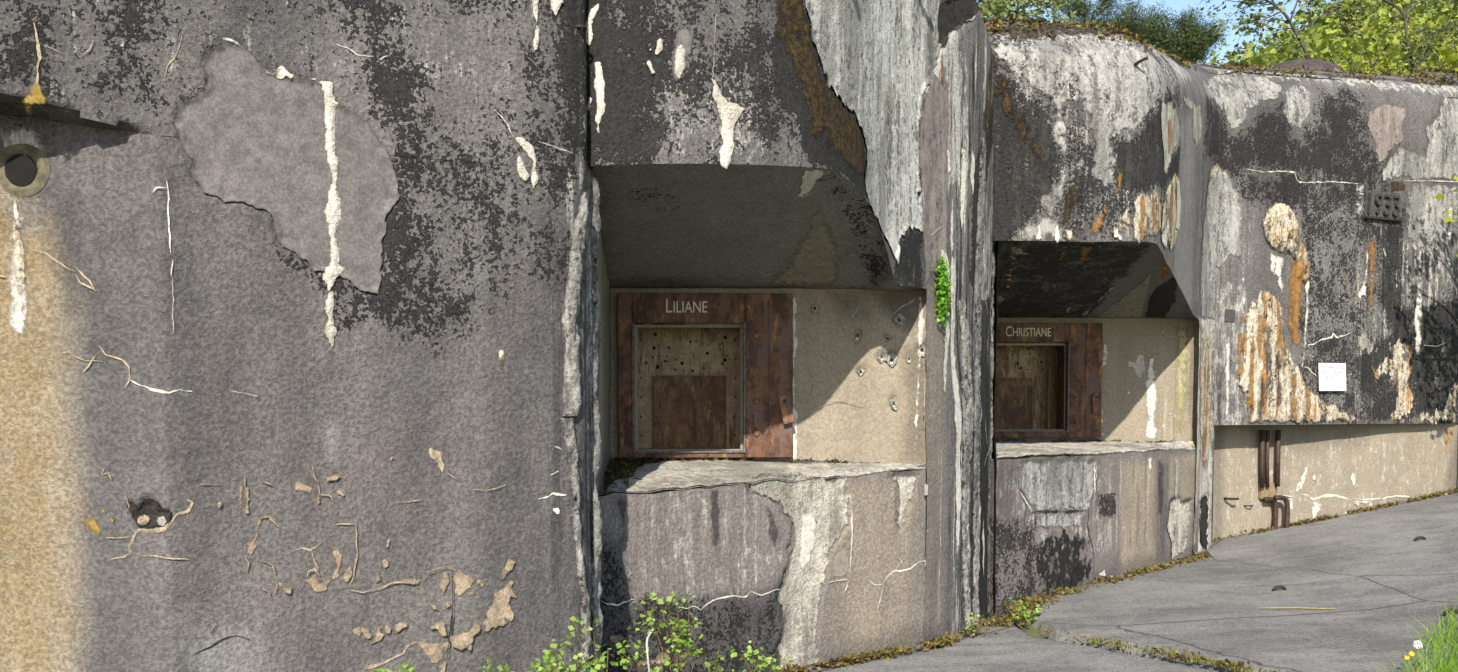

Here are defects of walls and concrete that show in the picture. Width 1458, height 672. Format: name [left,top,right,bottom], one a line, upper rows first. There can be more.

peeling [174,38,400,294]
spalling [805,0,977,285]
spalling [991,38,1311,216]
spalling [856,313,926,376]
spalling [127,498,171,529]
peeling [200,477,353,595]
peeling [295,466,344,504]
peeling [352,622,408,644]
peeling [401,558,517,672]
crack [681,589,779,610]
spalling [624,460,924,672]
water stain [1025,529,1092,595]